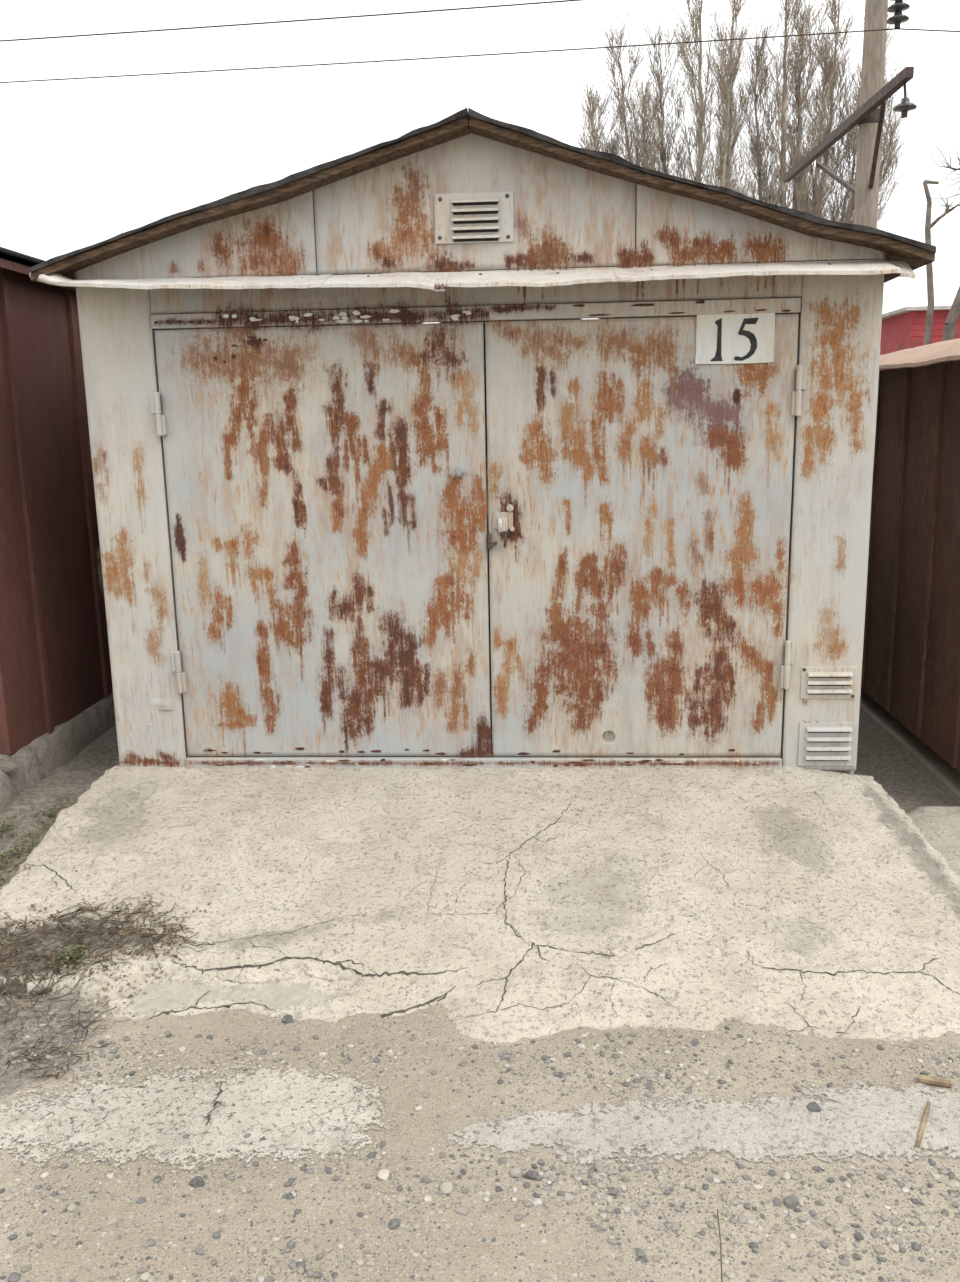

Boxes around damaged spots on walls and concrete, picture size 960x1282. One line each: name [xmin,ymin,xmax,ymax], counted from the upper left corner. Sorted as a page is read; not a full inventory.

corrosion [198,218,306,289]
corrosion [368,160,474,303]
corrosion [505,214,594,305]
corrosion [617,225,785,296]
corrosion [800,297,870,477]
corrosion [102,528,167,618]
corrosion [122,318,788,768]
corrosion [836,536,846,571]
corrosion [814,610,847,658]
crack [146,795,679,1021]
crack [747,950,959,1034]